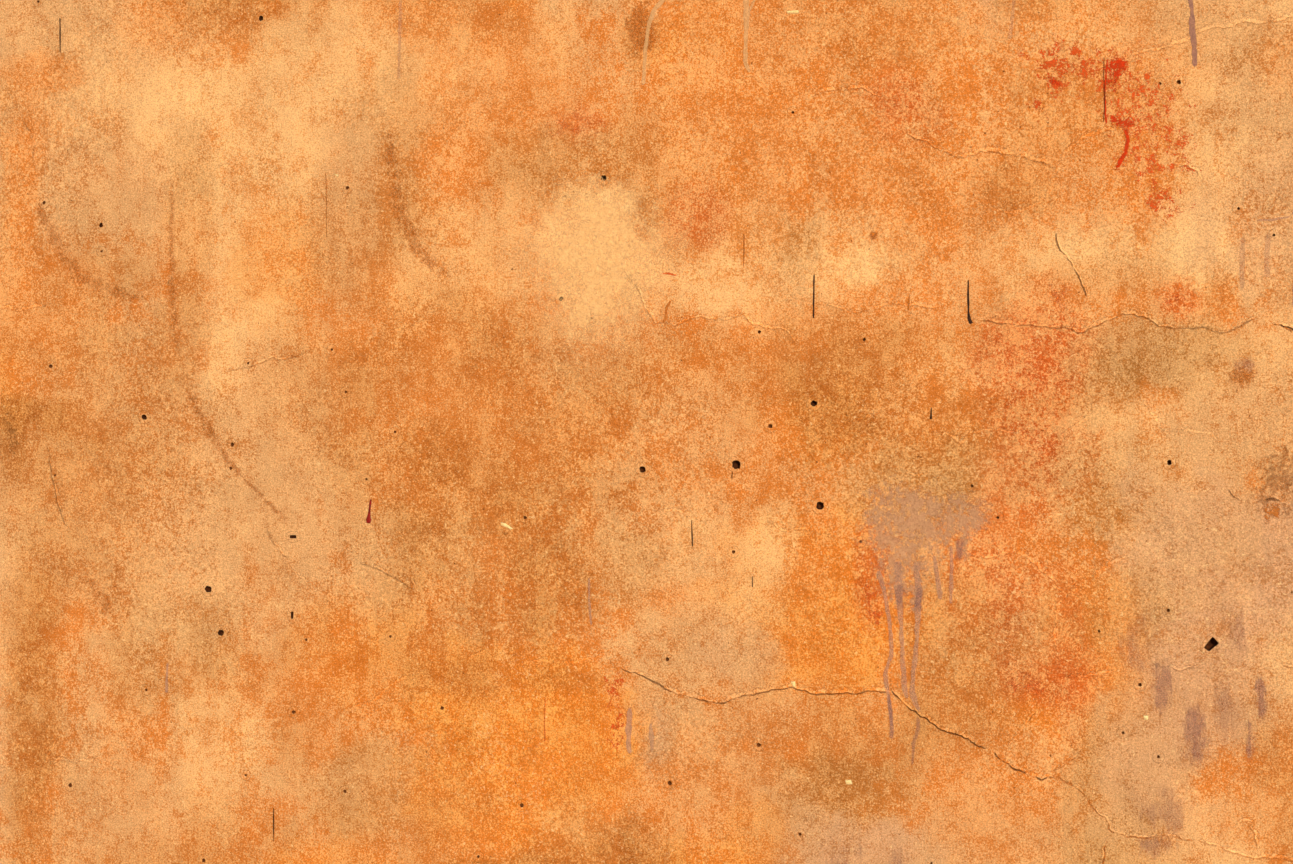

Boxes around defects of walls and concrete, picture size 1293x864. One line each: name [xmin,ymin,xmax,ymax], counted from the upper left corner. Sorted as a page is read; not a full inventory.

corrosion [1018,34,1206,222]
crack [985,234,1293,333]
crack [462,650,1293,864]